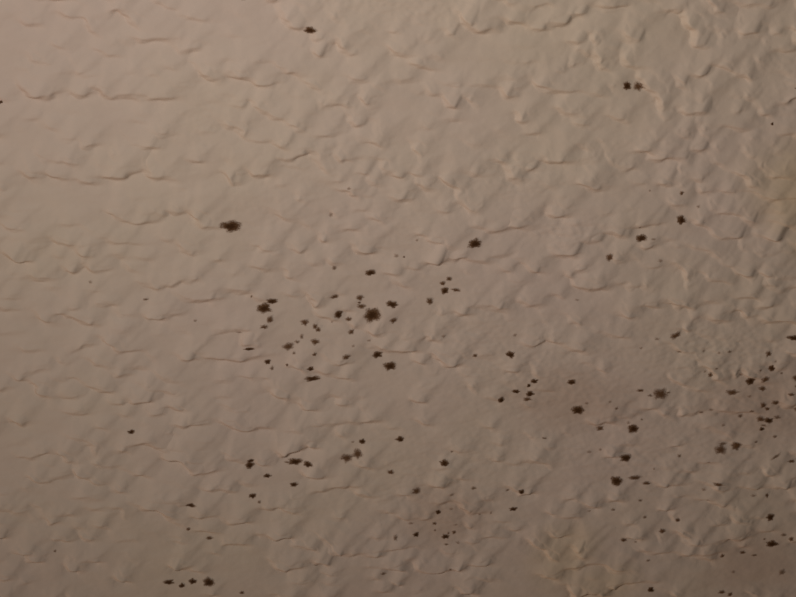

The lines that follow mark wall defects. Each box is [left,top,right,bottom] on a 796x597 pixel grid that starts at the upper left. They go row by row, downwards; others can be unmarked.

leakage [257,299,277,329]
leakage [357,295,381,322]
leakage [477,349,796,463]
leakage [381,459,796,597]